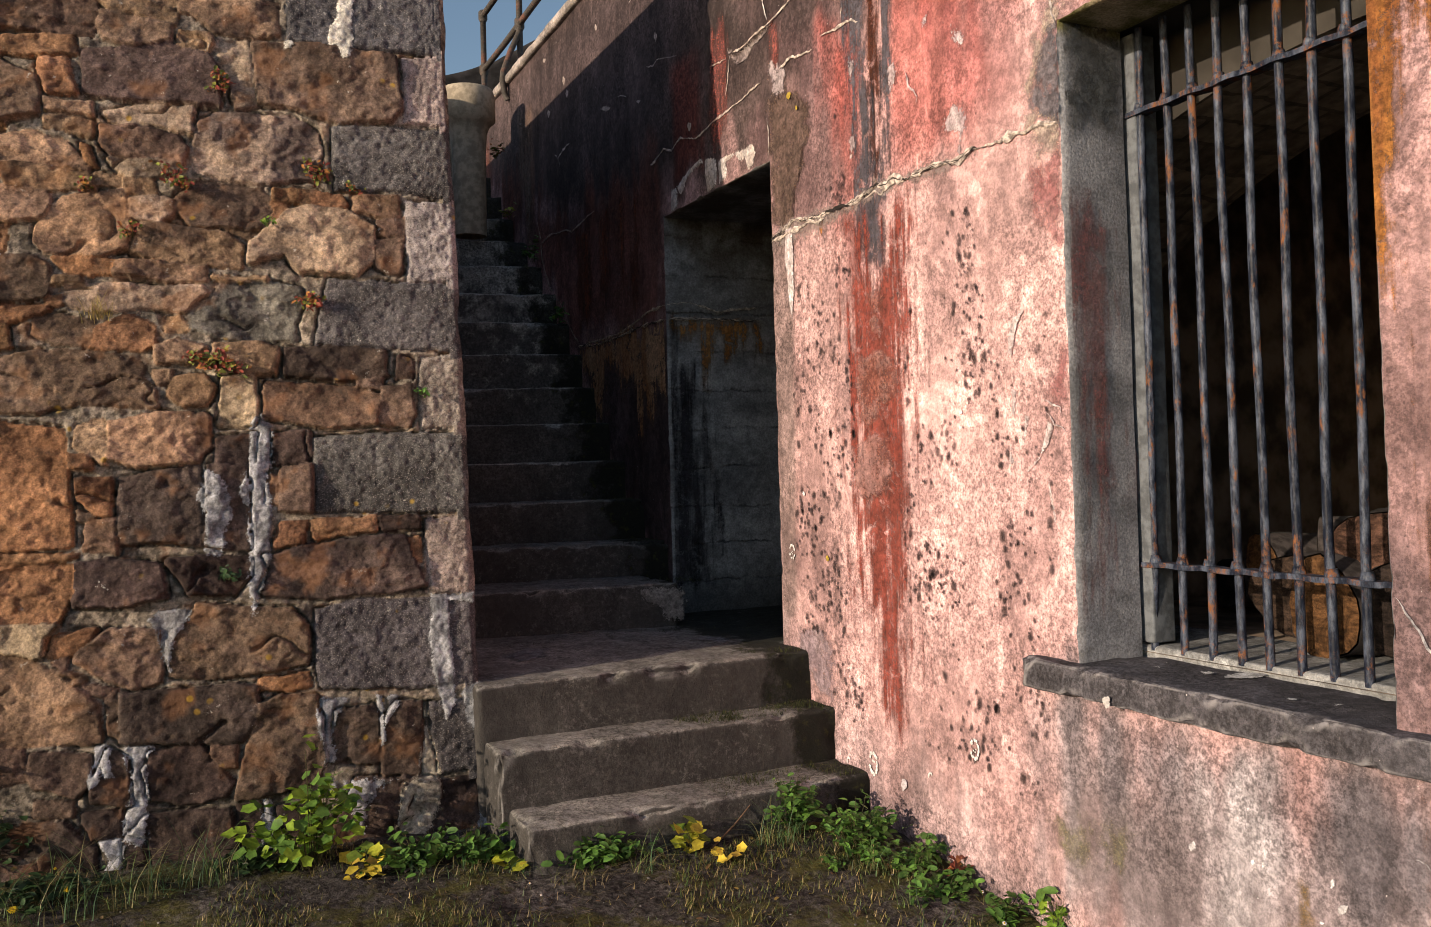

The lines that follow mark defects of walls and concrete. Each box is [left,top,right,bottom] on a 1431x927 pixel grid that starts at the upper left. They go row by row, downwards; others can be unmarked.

corrosion [710,32,726,151]
crack [650,0,858,165]
corrosion [769,30,778,65]
damp [767,60,786,95]
damp [772,0,976,318]
crack [771,120,1056,242]
corrosion [1366,0,1431,297]
corrosion [669,314,768,385]
damp [196,413,275,616]
corrosion [839,188,932,737]
damp [316,591,478,835]
damp [86,744,155,871]